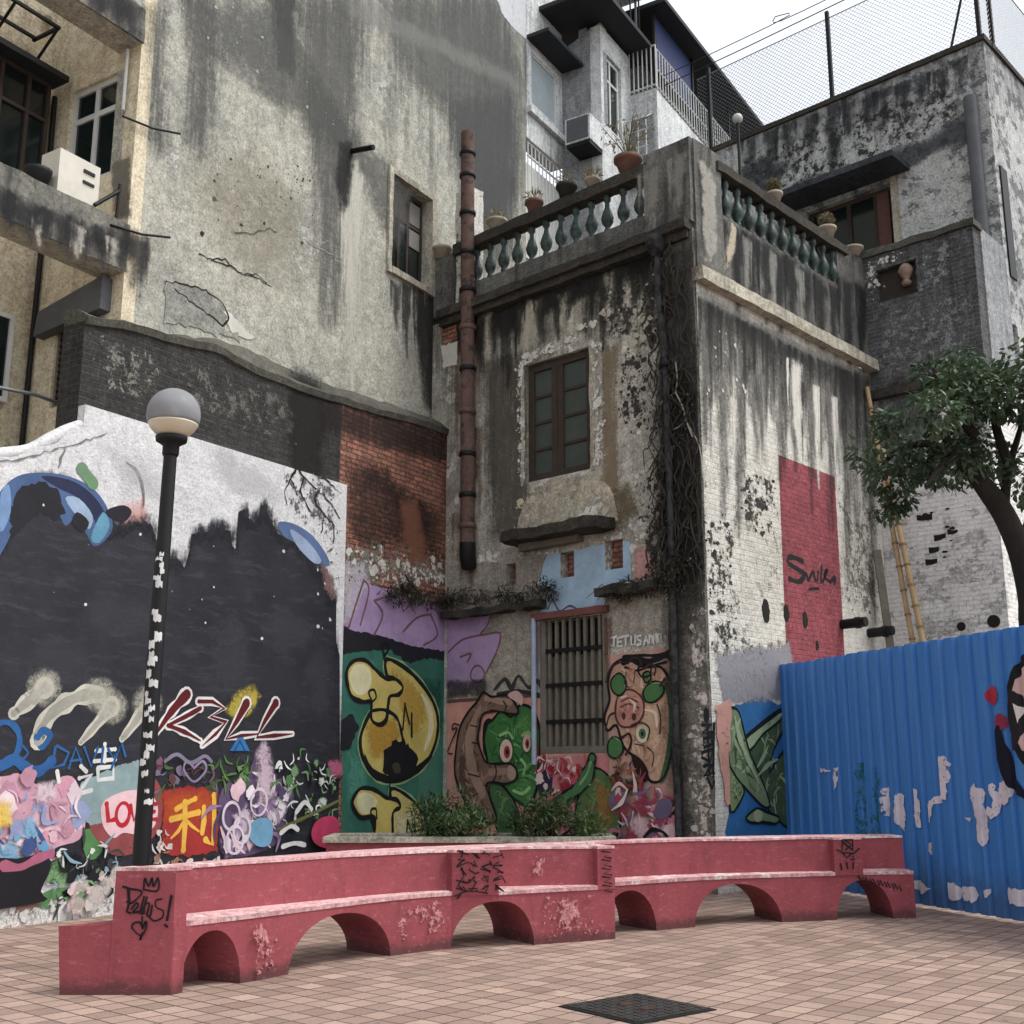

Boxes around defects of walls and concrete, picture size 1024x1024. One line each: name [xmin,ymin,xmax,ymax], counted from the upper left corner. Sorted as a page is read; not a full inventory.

damp [741,55,968,192]
damp [181,0,407,391]
flaking render [163,280,255,343]
crack [199,253,272,287]
damp [723,219,867,352]
peeling [89,332,297,445]
damp [475,264,667,593]
peeling [514,273,662,539]
damp [698,298,964,551]
crack [284,454,340,543]
peeling [687,470,782,837]
peeling [542,893,598,937]